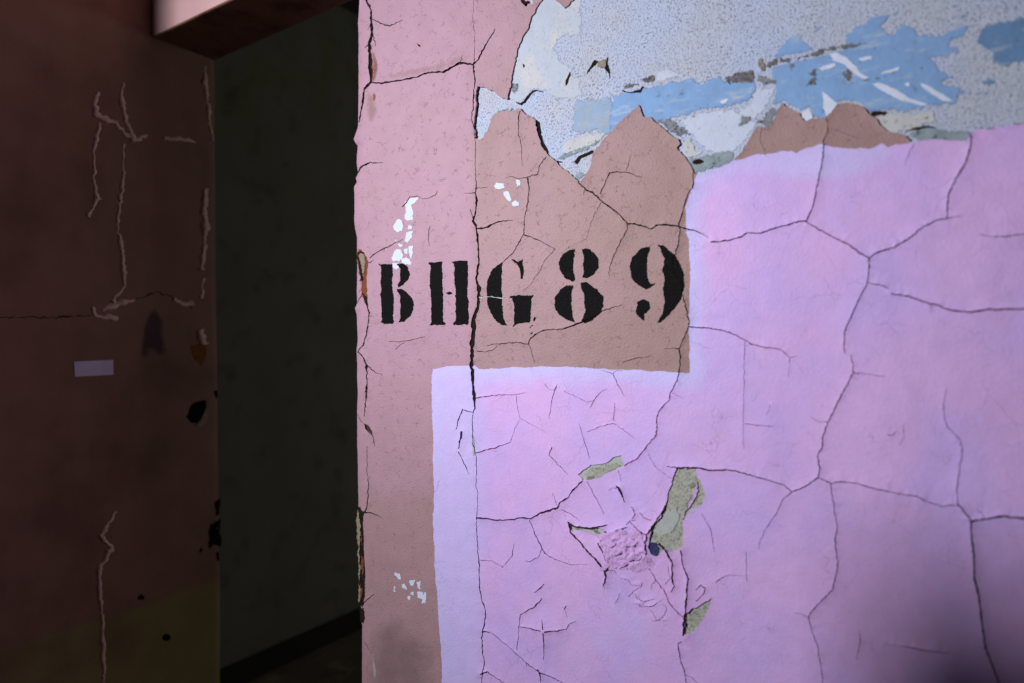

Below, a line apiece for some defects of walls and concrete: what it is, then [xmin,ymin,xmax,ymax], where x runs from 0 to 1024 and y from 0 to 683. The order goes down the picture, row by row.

peeling [475,0,1024,182]
crack [358,0,1024,683]
spalling [186,390,218,427]
peeling [578,455,624,480]
spalling [649,468,705,584]
spalling [684,598,712,636]